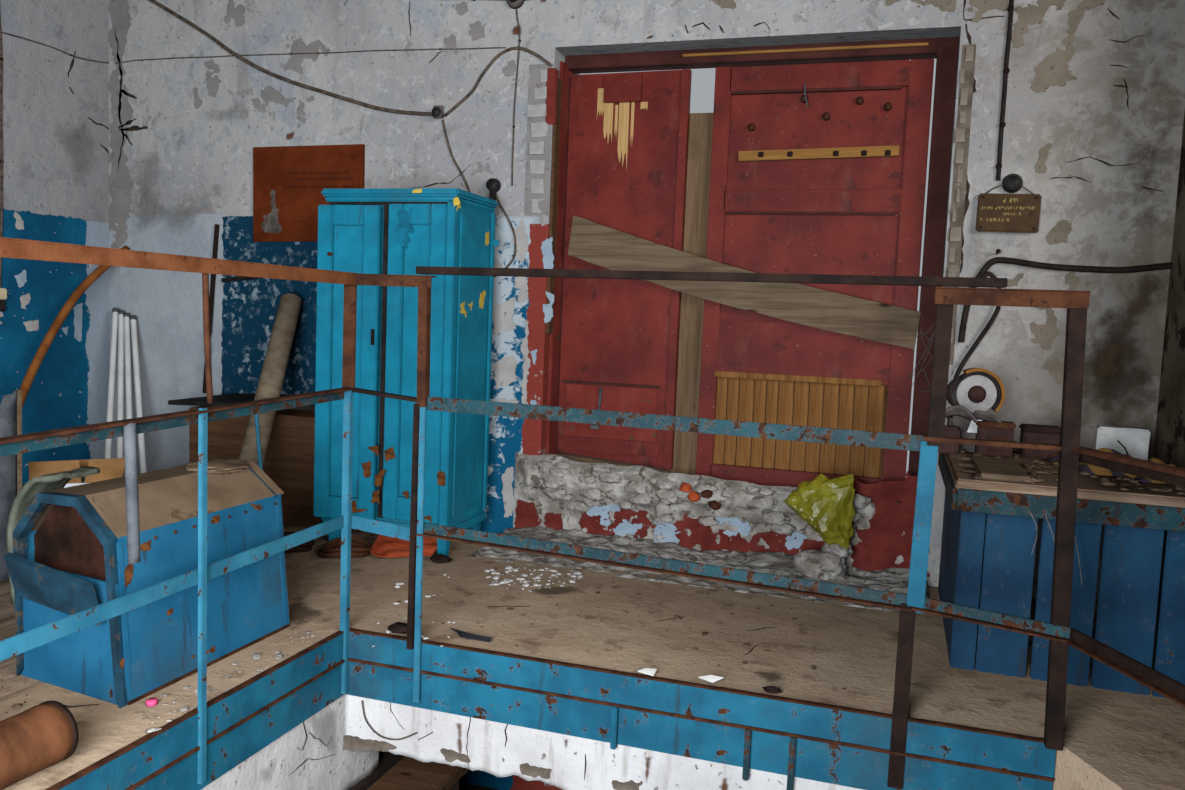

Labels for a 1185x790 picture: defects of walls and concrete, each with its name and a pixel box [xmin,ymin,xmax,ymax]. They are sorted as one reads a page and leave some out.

crack [68,51,76,94]
crack [88,27,148,171]
flaking render [885,0,1105,93]
flaking render [502,60,554,269]
peeling [14,212,24,230]
flaking render [1046,220,1072,245]
peeling [14,270,39,331]
peeling [62,303,83,342]
peeling [492,277,538,405]
peeling [543,291,555,323]
flaking render [1030,307,1064,385]
spalling [502,452,918,581]